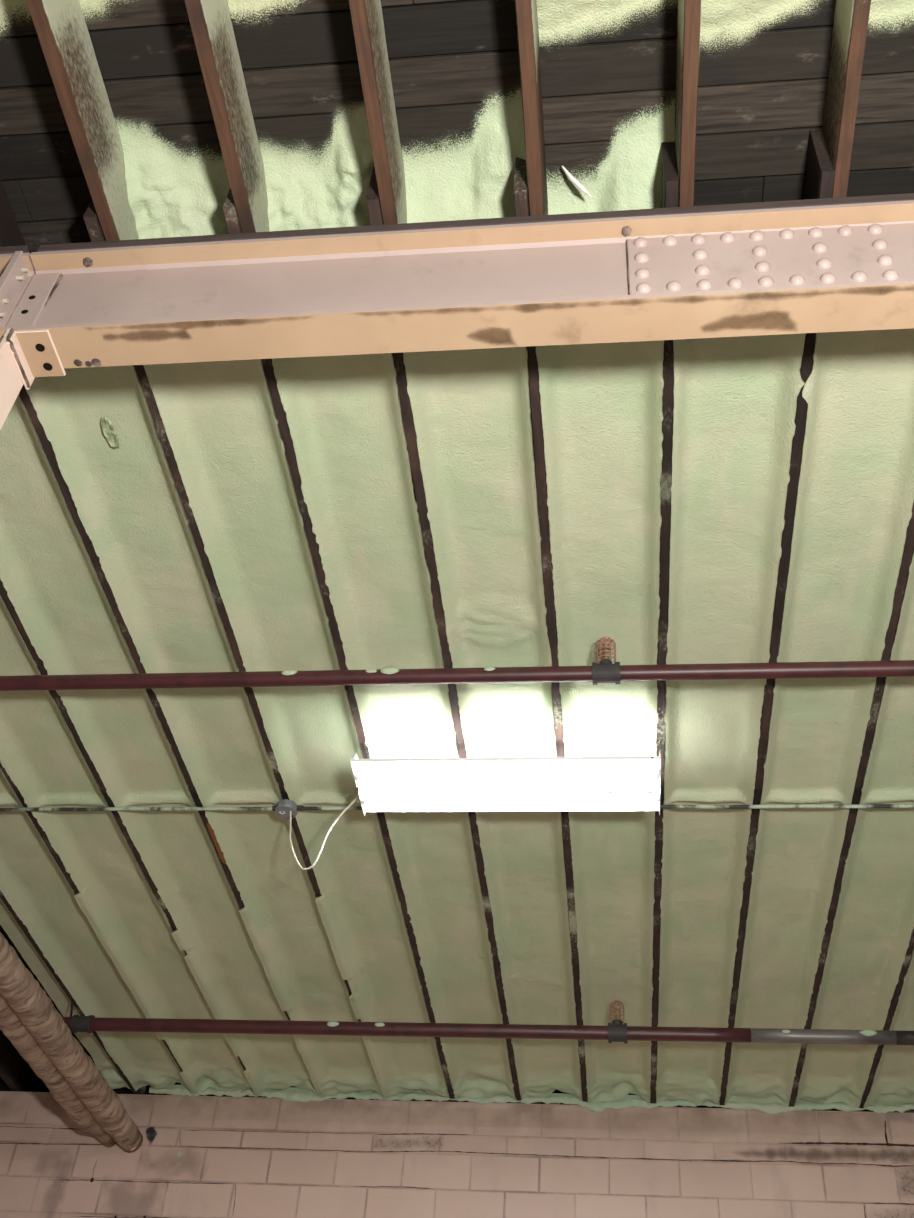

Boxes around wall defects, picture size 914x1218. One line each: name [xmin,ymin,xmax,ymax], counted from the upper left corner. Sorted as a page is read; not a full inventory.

damp [756,1150,914,1161]